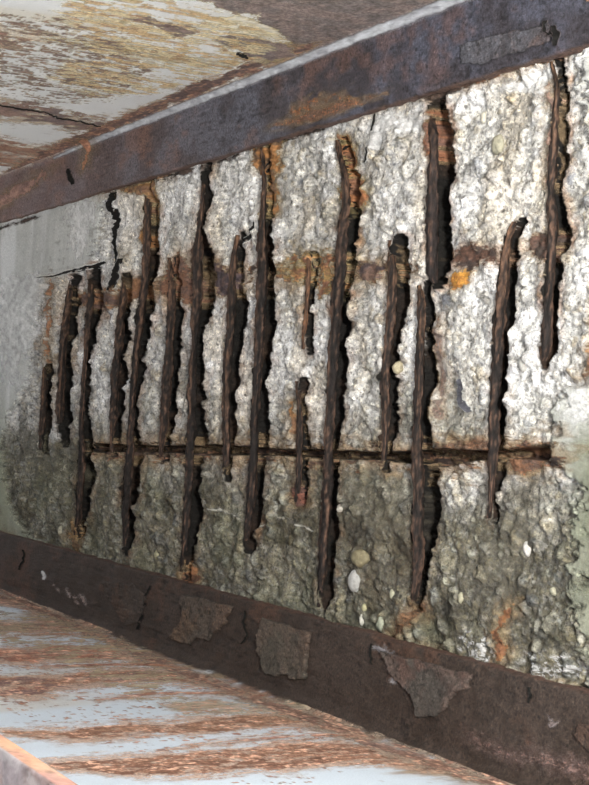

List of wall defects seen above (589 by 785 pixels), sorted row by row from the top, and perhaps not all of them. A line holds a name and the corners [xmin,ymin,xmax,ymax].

peeling [126,16,197,37]
peeling [197,0,438,62]
crack [0,104,101,127]
corrosion [0,0,314,215]
corrosion [450,241,517,290]
corrosion [525,232,573,264]
damp [0,275,44,385]
spalling [0,192,118,552]
spalling [78,51,589,689]
damp [558,382,589,422]
corrosion [422,436,567,479]
corrosion [0,589,515,785]